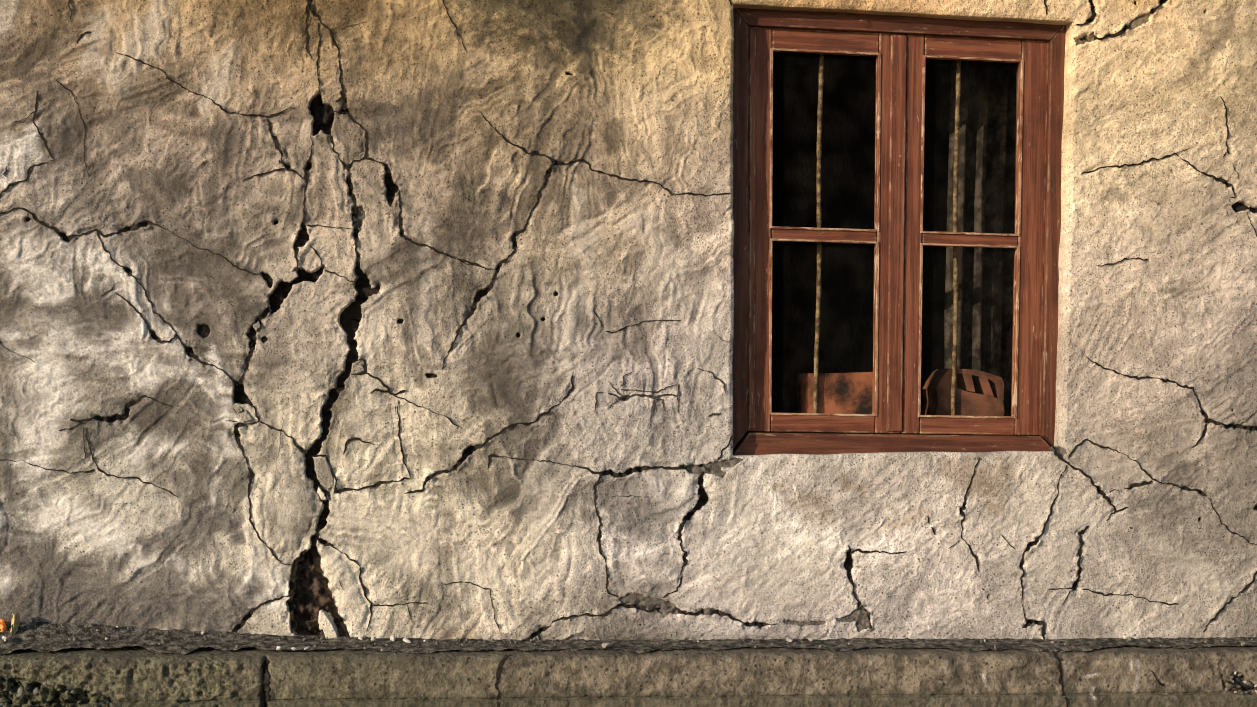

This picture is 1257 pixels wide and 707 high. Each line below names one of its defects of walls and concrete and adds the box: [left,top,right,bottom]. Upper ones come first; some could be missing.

crack [1074,0,1168,45]
crack [1080,96,1257,237]
crack [1096,257,1148,266]
crack [0,0,907,707]
crack [1086,356,1257,448]
crack [928,457,989,599]
crack [1001,435,1257,707]